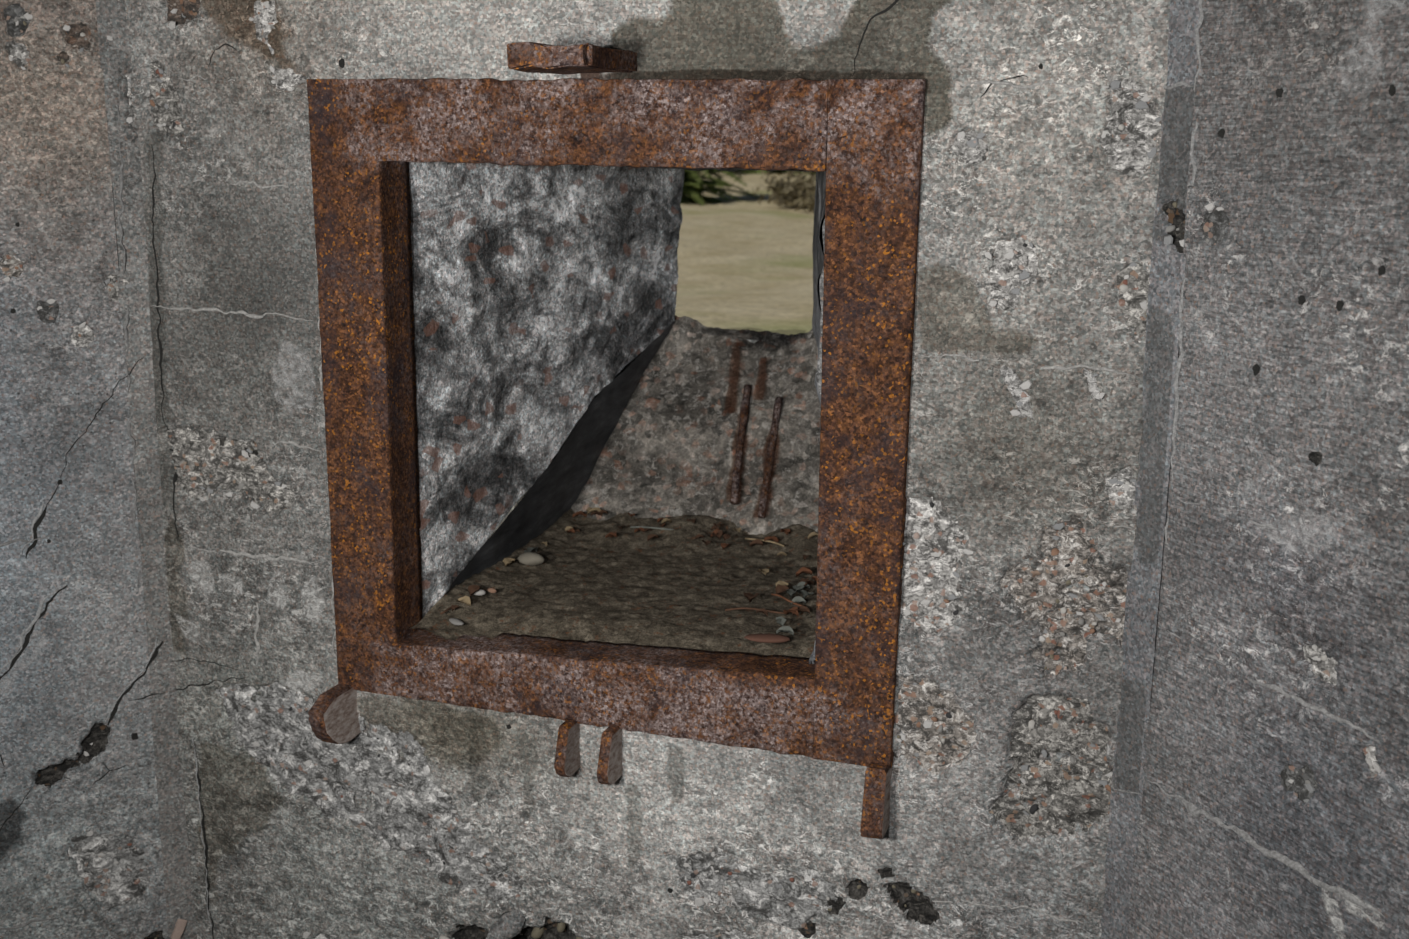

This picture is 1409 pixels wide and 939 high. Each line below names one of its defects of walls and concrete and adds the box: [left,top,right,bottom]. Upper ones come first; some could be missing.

crack [0,582,68,679]
crack [104,638,247,725]
hole [35,723,111,788]
peeling [215,680,584,939]
peeling [667,846,940,939]